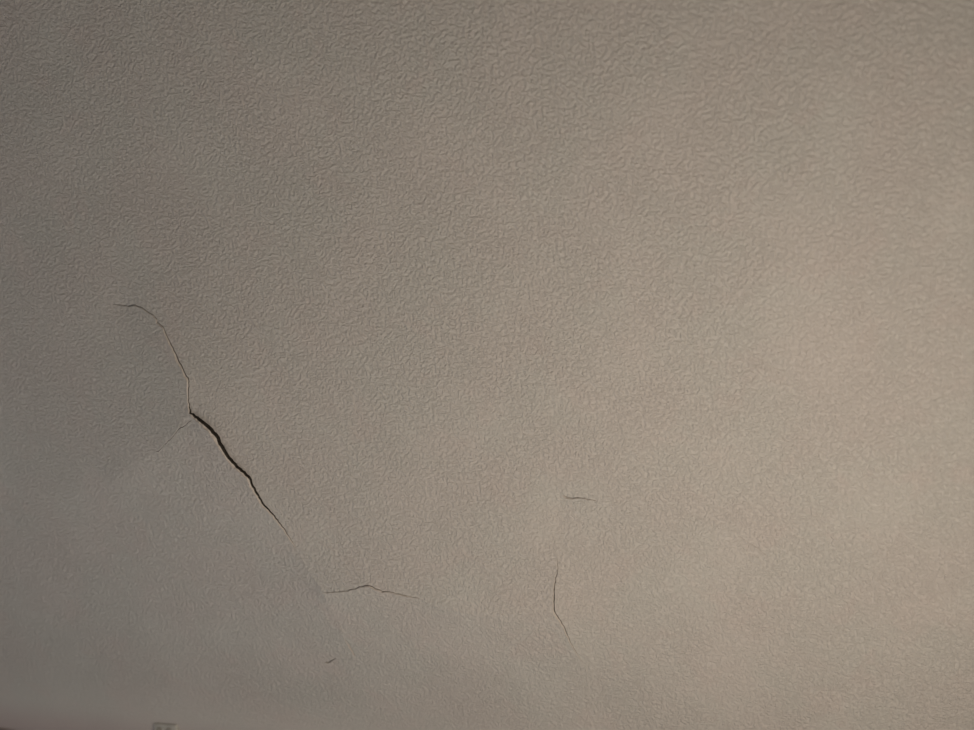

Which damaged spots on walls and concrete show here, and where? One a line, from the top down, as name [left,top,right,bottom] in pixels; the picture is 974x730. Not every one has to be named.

crack [112,304,296,548]
crack [328,585,415,598]
crack [552,560,583,664]